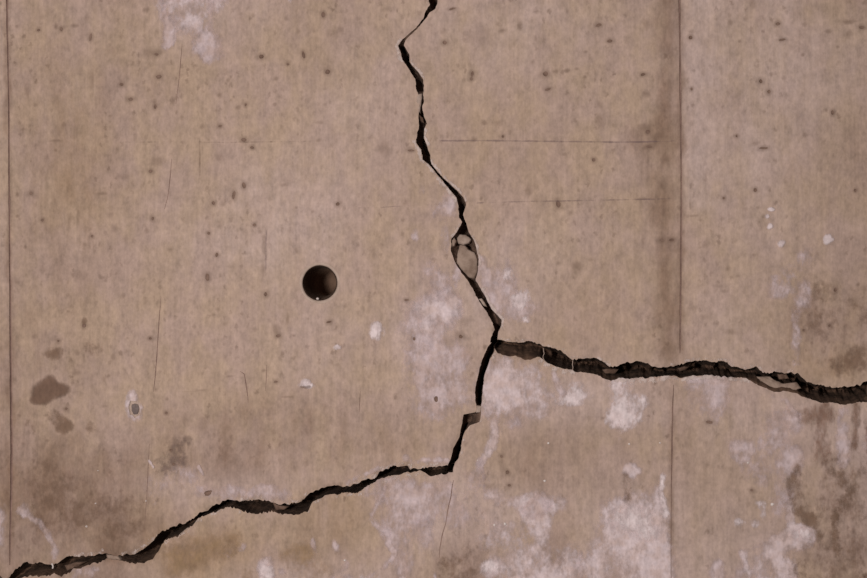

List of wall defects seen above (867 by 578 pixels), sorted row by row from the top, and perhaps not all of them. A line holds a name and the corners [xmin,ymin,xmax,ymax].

crack [395,0,867,405]
crack [153,300,161,386]
leakage [31,377,68,404]
crack [9,343,495,578]
leakage [836,410,850,468]